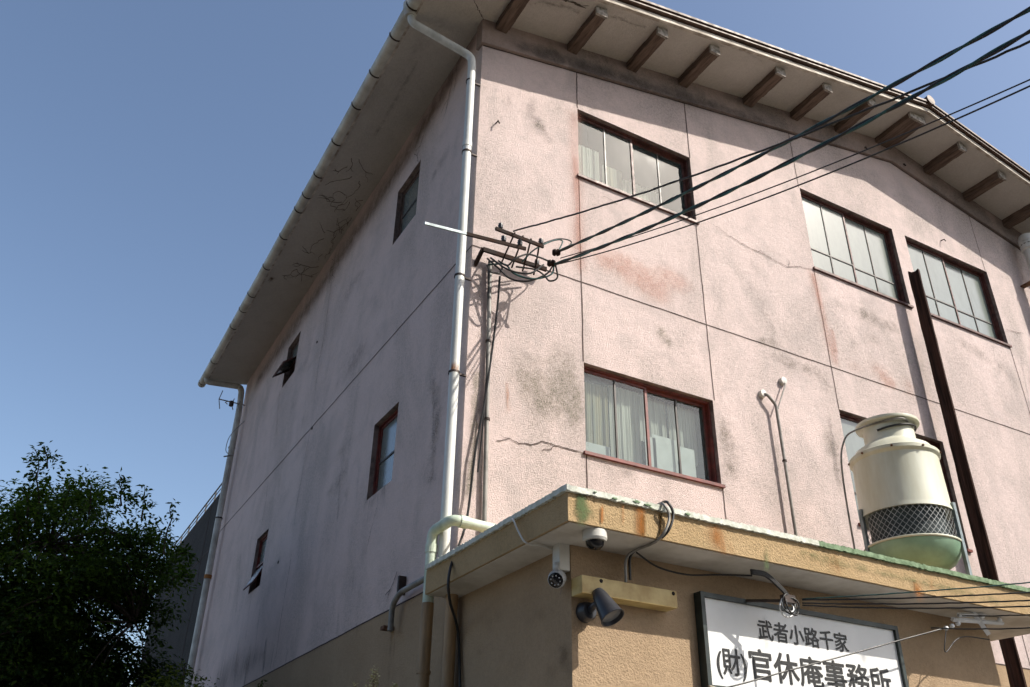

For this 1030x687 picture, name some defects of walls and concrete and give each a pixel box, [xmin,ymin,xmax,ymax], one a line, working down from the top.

crack [713,224,810,269]
crack [497,435,582,453]